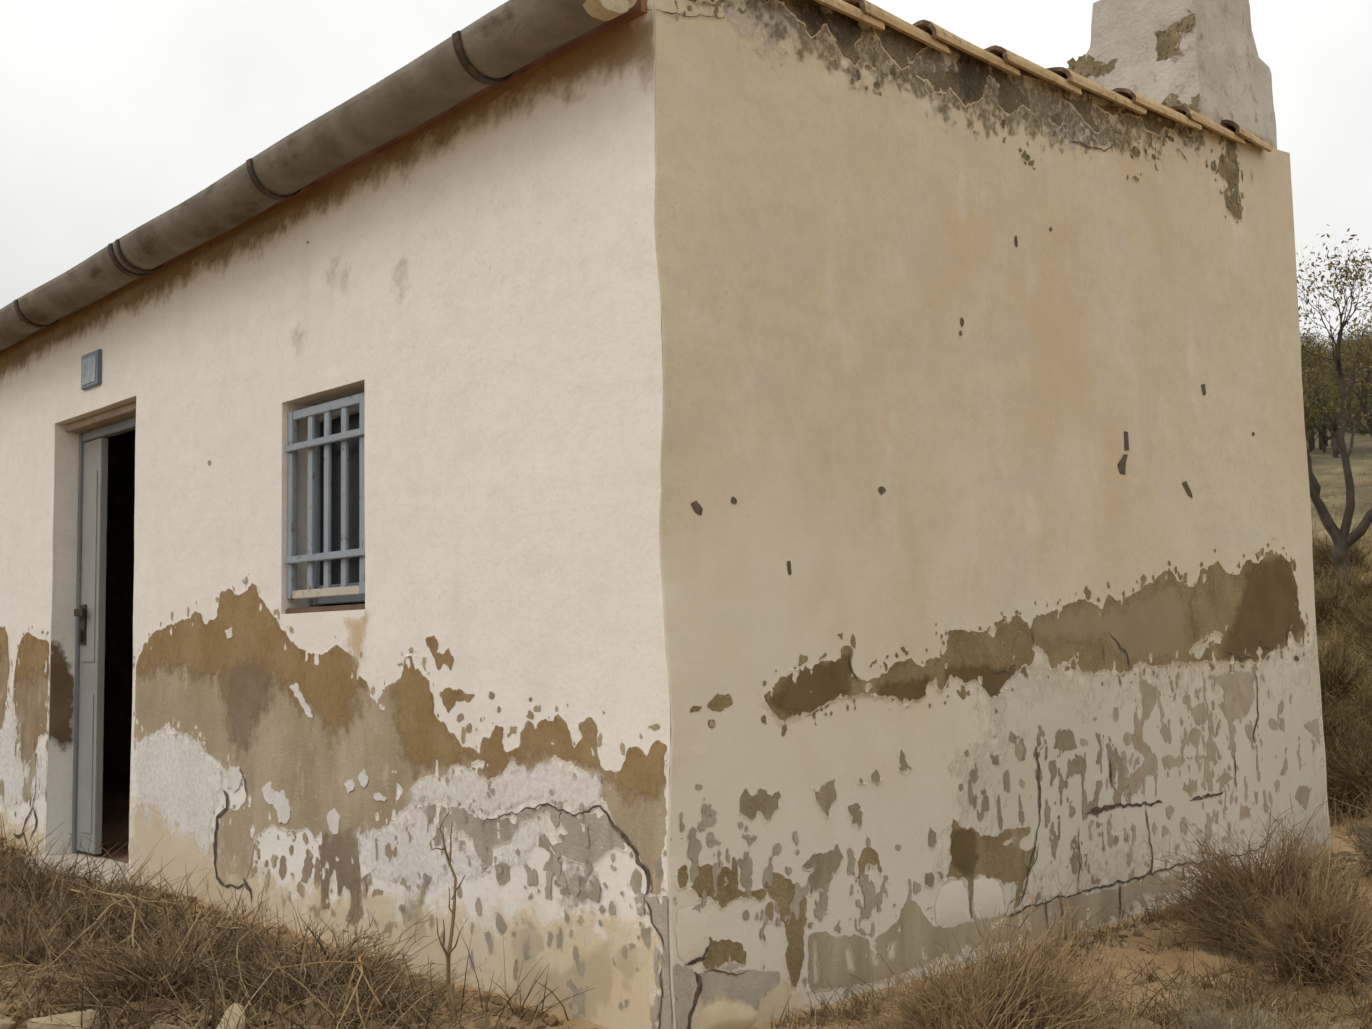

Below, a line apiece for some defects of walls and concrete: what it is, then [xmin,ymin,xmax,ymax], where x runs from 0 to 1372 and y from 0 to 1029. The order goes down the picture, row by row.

leakage [0,21,654,375]
spalling [675,0,1244,224]
spalling [691,501,703,515]
peeling [0,624,50,816]
crack [213,769,252,902]
crack [484,803,746,1029]
peeling [133,538,1330,1029]
crack [1007,619,1289,933]